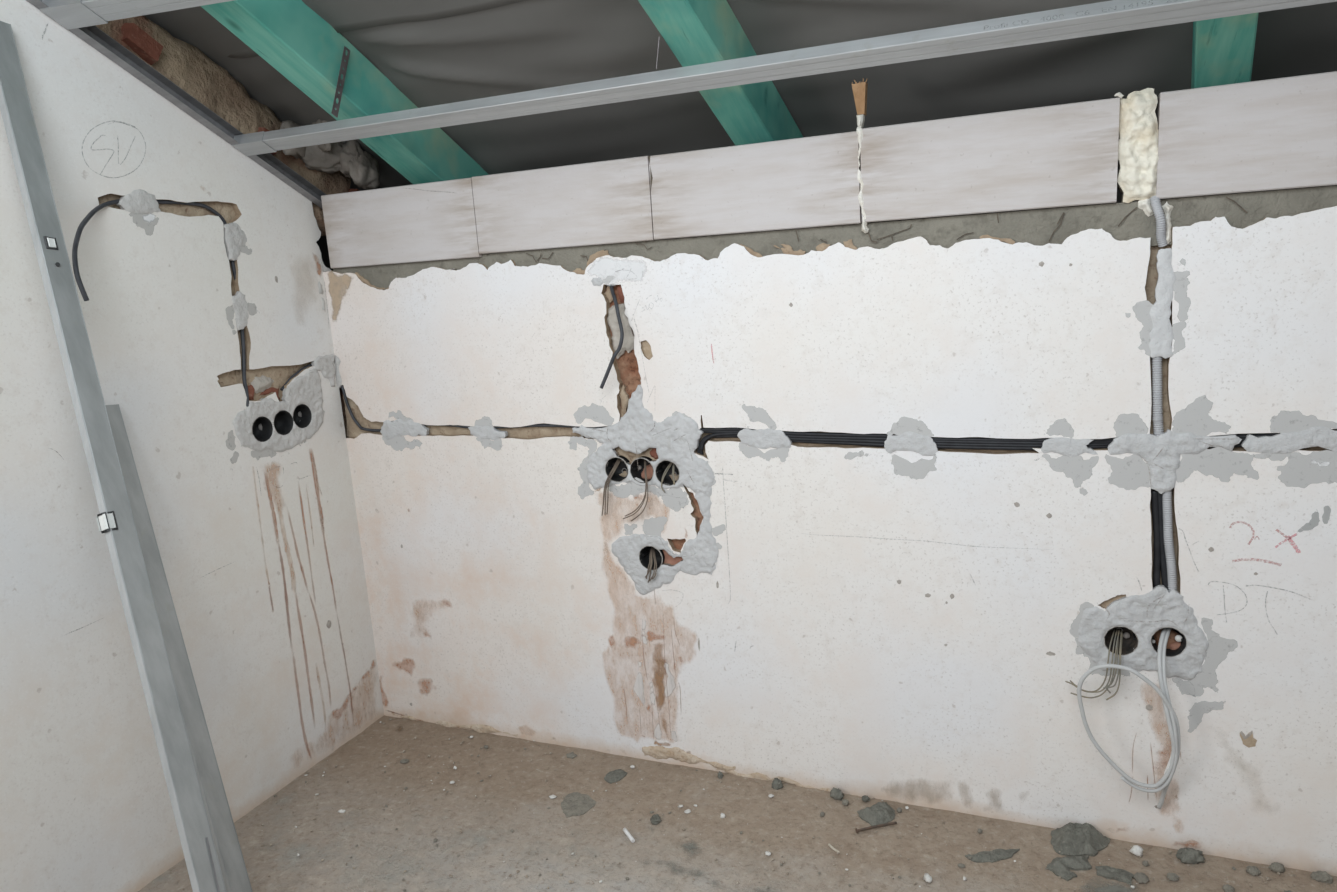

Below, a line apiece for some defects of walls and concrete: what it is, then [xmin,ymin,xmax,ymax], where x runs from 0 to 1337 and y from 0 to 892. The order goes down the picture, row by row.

peeling [588,258,646,285]
flaking render [328,272,351,320]